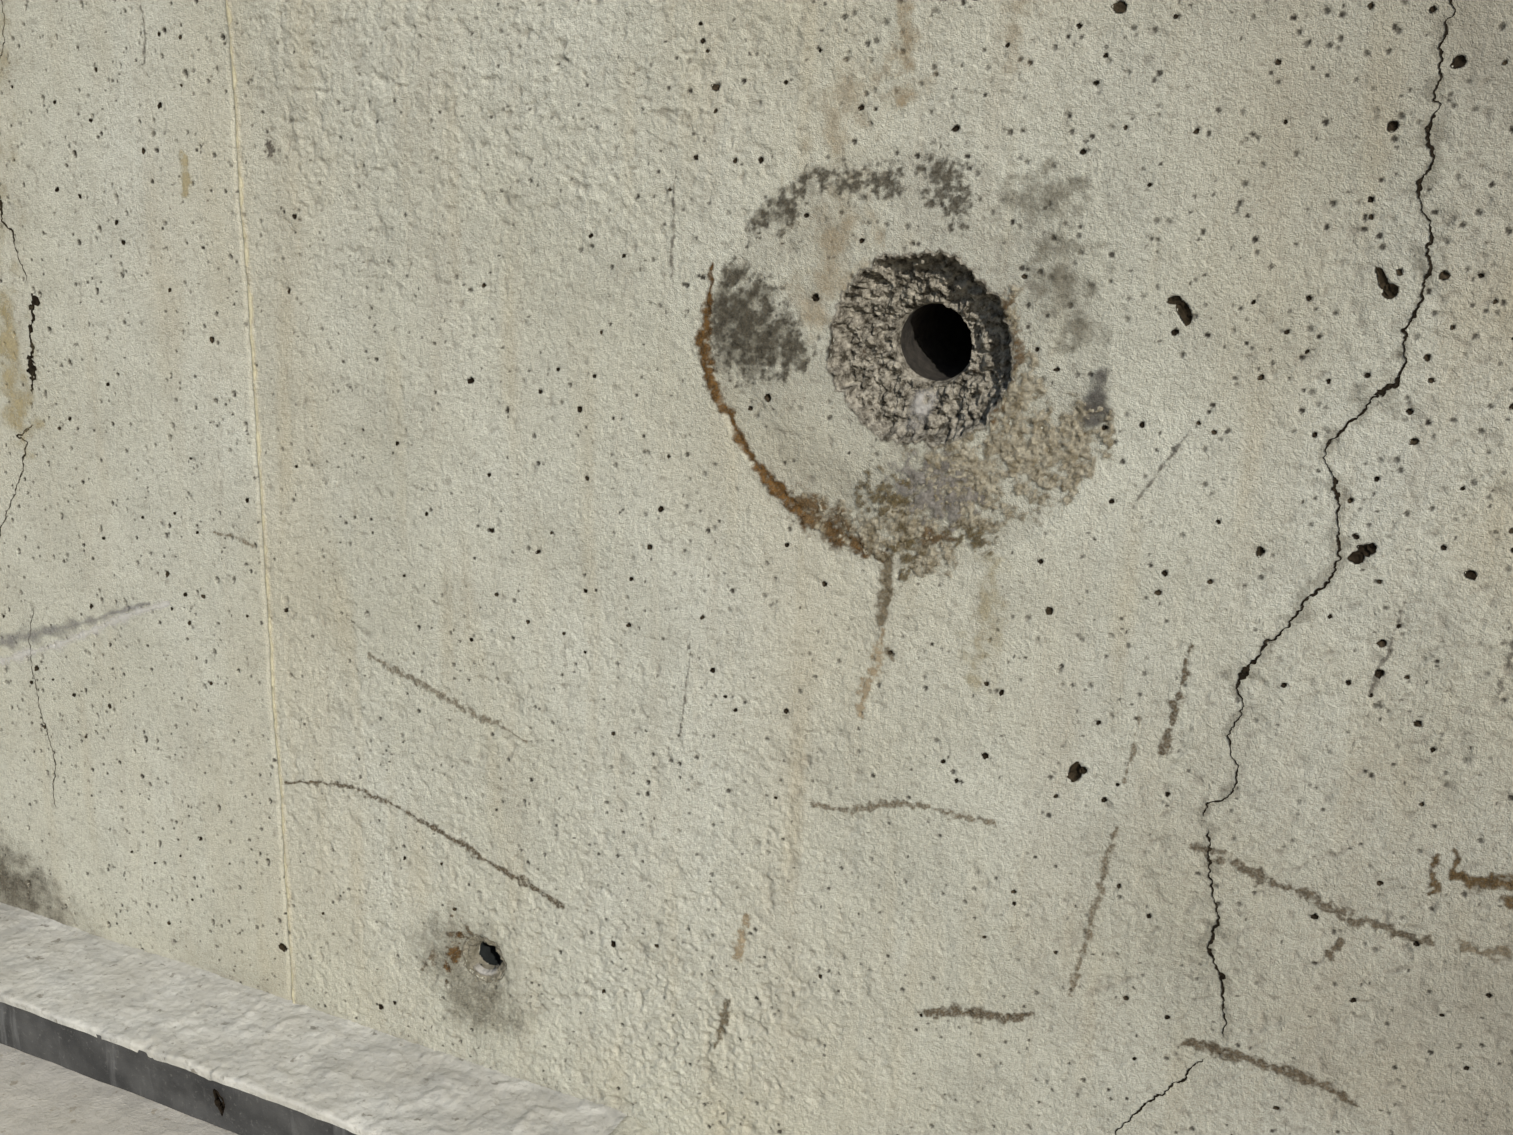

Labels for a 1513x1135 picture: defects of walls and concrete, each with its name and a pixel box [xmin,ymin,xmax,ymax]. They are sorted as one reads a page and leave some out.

crack [0,196,40,536]
corrosion [1003,296,1025,382]
corrosion [856,553,893,719]
crack [1115,0,1456,1134]